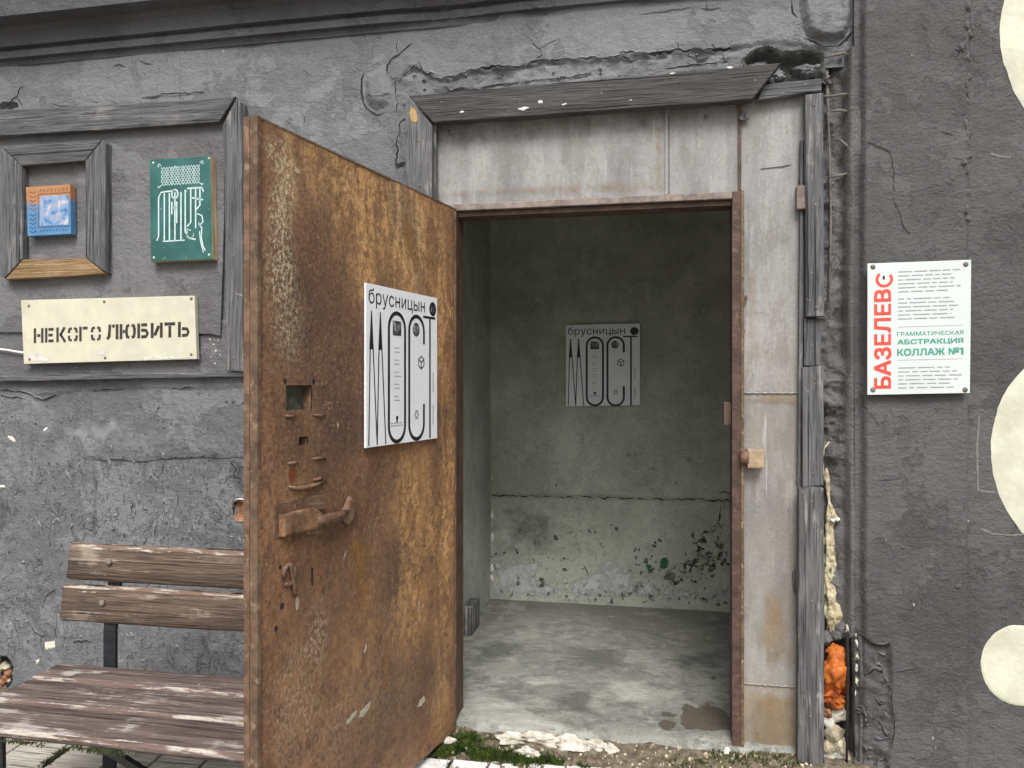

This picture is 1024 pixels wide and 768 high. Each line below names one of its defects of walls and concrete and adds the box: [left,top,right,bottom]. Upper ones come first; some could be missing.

crack [386,37,412,79]
crack [870,143,910,233]
spalling [398,42,896,768]
water stain [658,704,730,731]